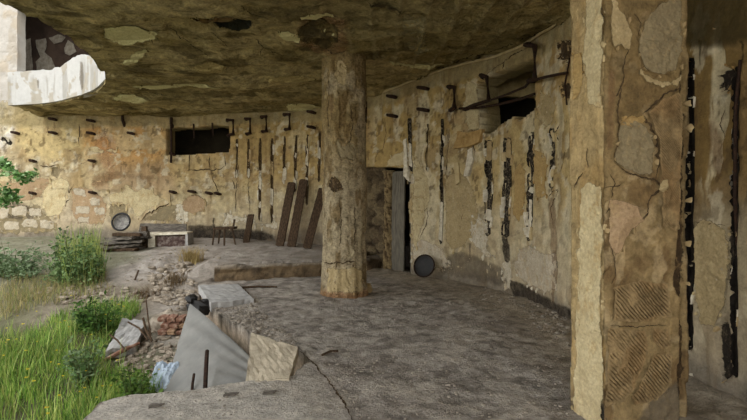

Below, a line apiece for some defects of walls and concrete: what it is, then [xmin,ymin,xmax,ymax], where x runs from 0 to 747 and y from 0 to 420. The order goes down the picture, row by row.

flaking render [555,0,687,109]
spalling [614,115,659,175]
crack [605,50,680,219]
spalling [682,96,696,132]
spalling [719,64,737,94]
spalling [0,164,207,235]
flaking render [387,139,558,295]
flaking render [673,140,738,383]
crack [301,352,352,419]
spalling [677,320,693,396]